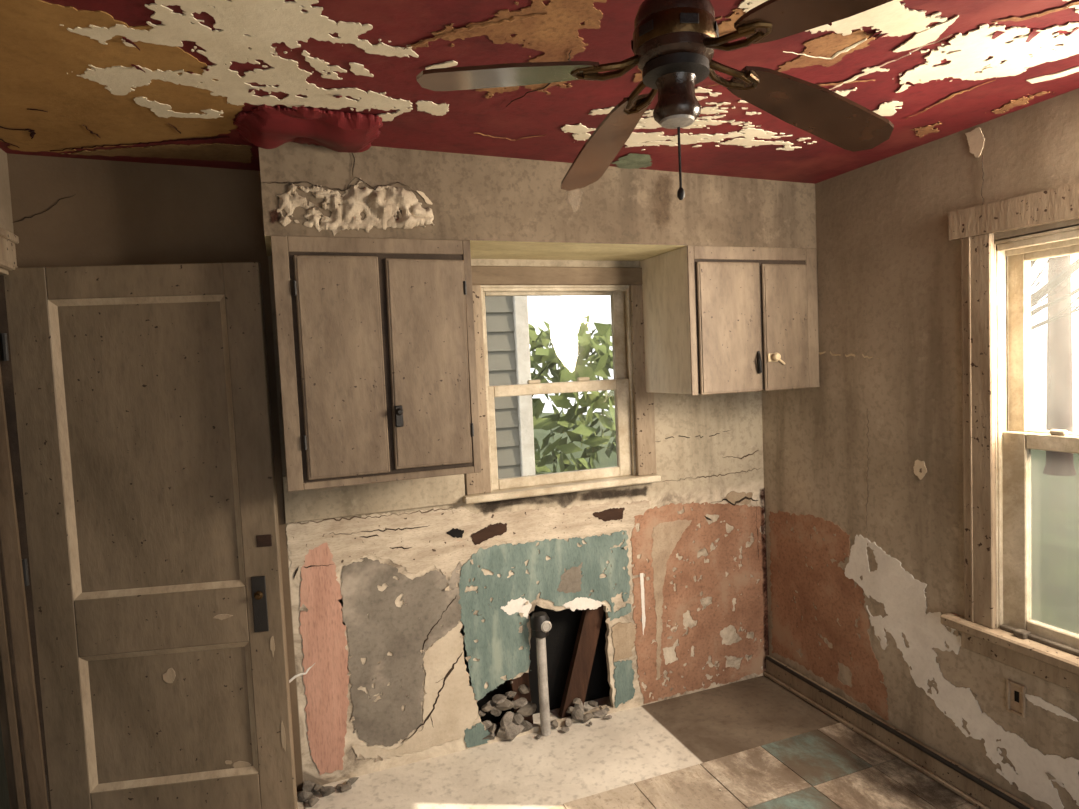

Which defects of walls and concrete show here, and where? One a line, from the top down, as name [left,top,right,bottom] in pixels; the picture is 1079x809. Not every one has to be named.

peeling [715,0,768,34]
peeling [0,0,614,164]
peeling [776,0,1079,116]
peeling [625,87,817,151]
peeling [910,122,942,137]
peeling [965,127,985,157]
crack [422,597,456,654]
peeling [286,491,1079,809]
crack [401,652,463,743]